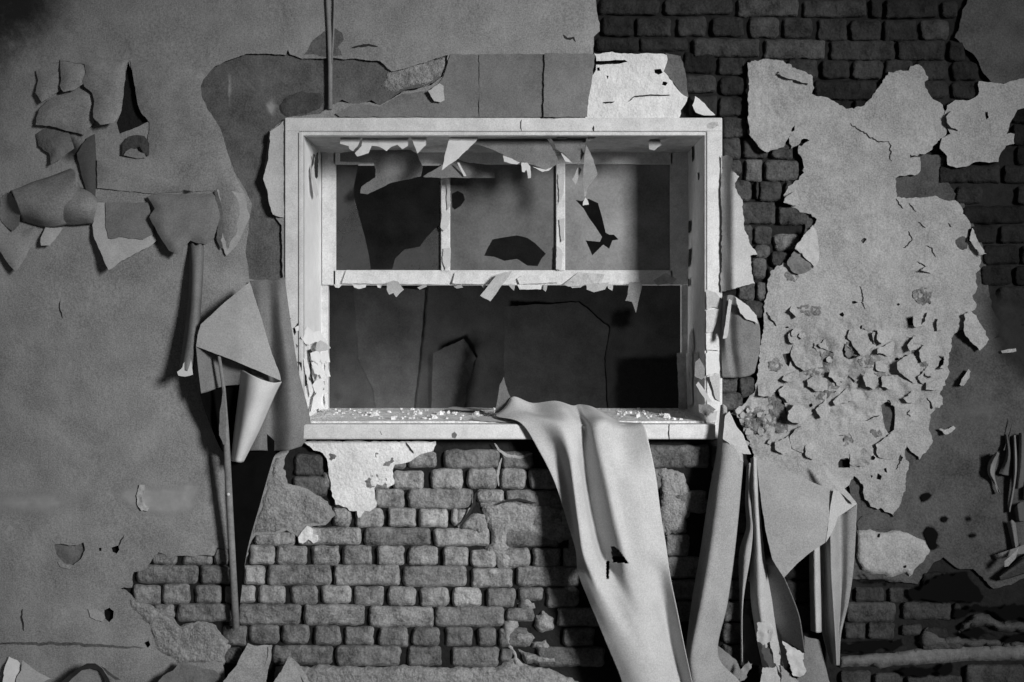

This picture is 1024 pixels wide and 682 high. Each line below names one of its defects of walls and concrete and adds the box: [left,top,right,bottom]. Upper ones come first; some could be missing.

peeling [441,137,597,231]
peeling [334,218,613,301]
flaking render [585,0,1024,531]
peeling [290,318,331,412]
flaking render [123,432,605,668]
flaking render [649,444,717,622]
flaking render [720,473,752,667]
flaking render [784,557,810,626]
flaking render [840,571,963,655]
flaking render [839,664,1024,682]